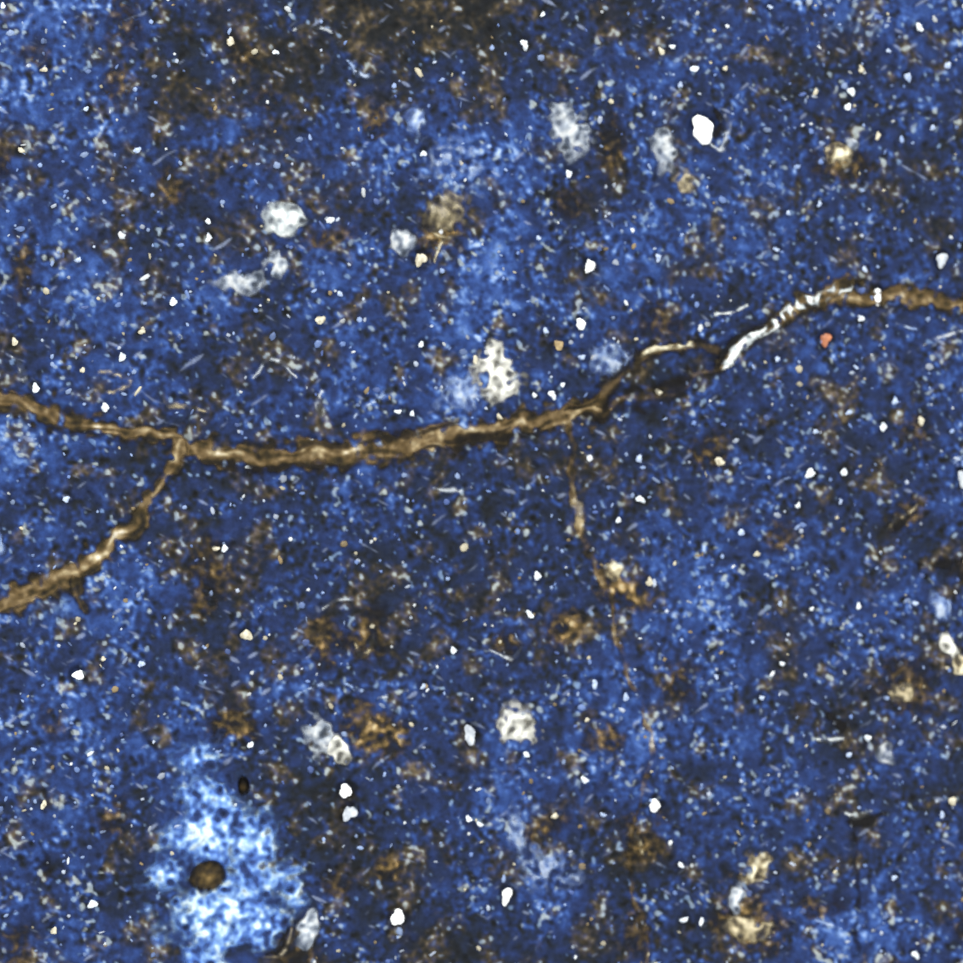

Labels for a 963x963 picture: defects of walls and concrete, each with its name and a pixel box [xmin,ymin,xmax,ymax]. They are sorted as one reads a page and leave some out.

crack [0,273,963,690]
crack [643,711,653,747]
crack [825,712,851,732]
crack [631,887,646,934]